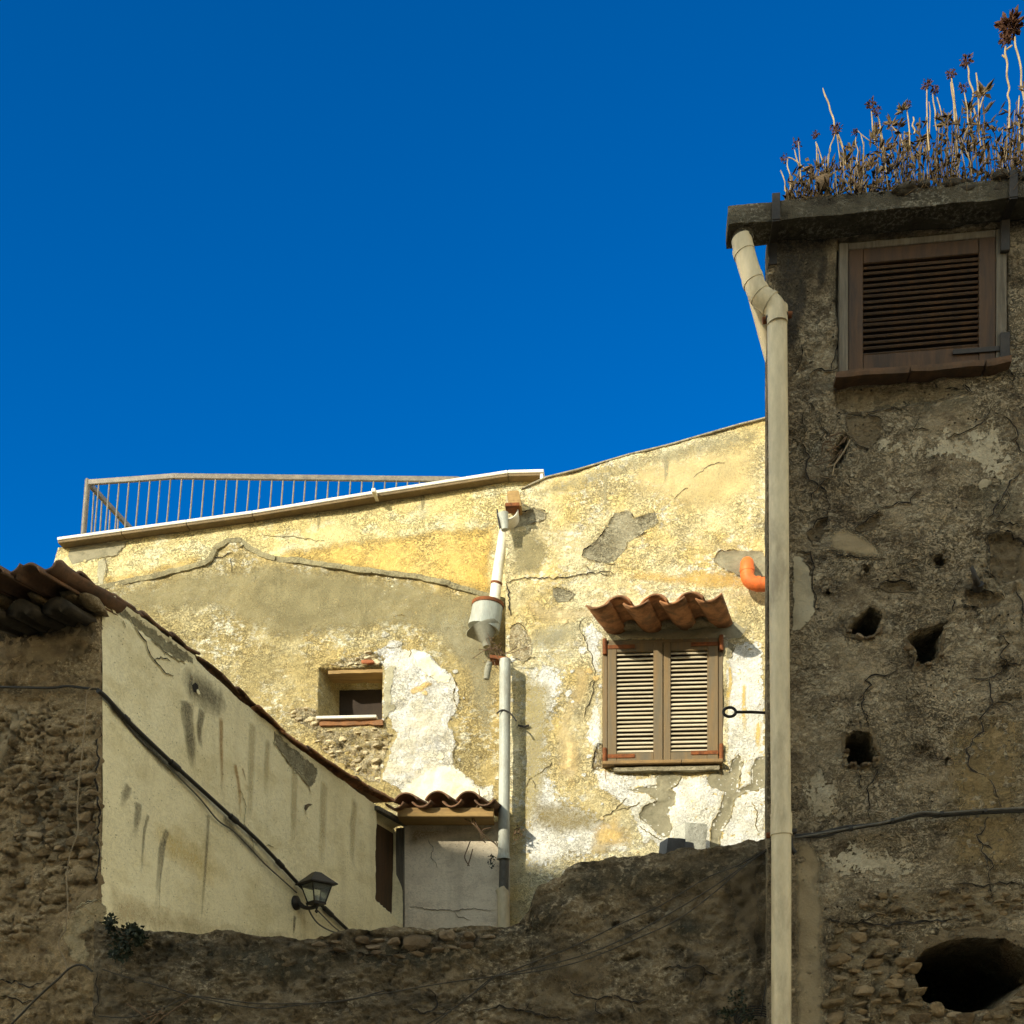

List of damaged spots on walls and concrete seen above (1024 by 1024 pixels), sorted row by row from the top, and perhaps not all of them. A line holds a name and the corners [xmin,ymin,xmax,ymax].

crack [214,534,324,574]
spalling [581,511,659,564]
spalling [713,549,765,577]
spalling [790,556,835,634]
crack [105,606,173,676]
crack [579,618,596,721]
water stain [112,708,171,771]
water stain [182,678,221,757]
spalling [274,733,318,791]
flaking render [288,632,499,801]
flaking render [509,586,765,875]
crack [825,586,1024,927]